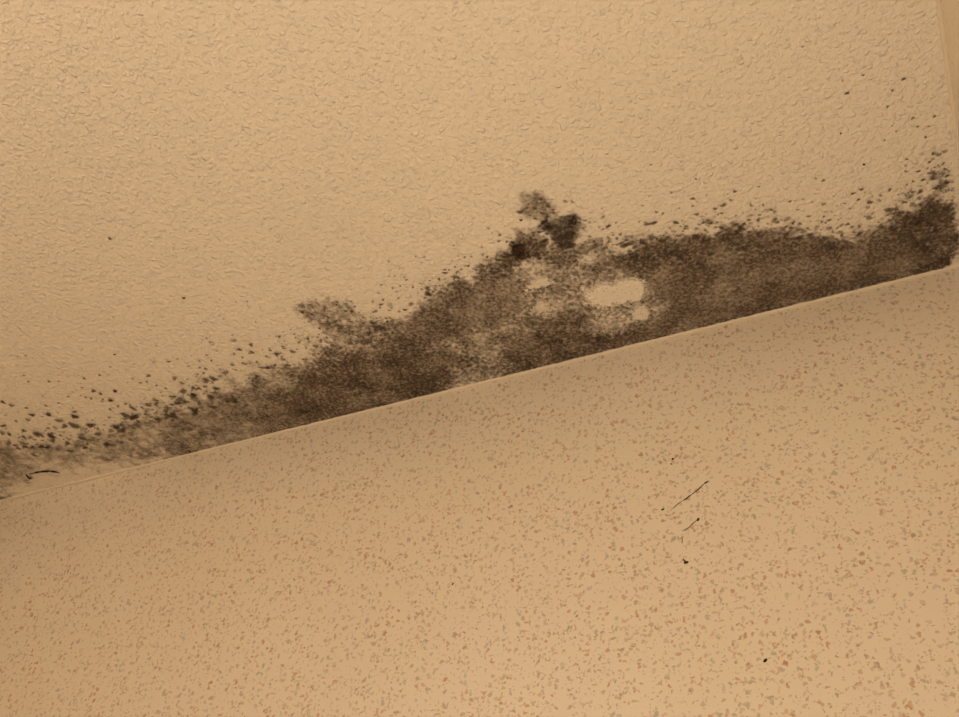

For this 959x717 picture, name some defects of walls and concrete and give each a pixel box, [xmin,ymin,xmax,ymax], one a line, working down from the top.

damp [0,152,959,478]